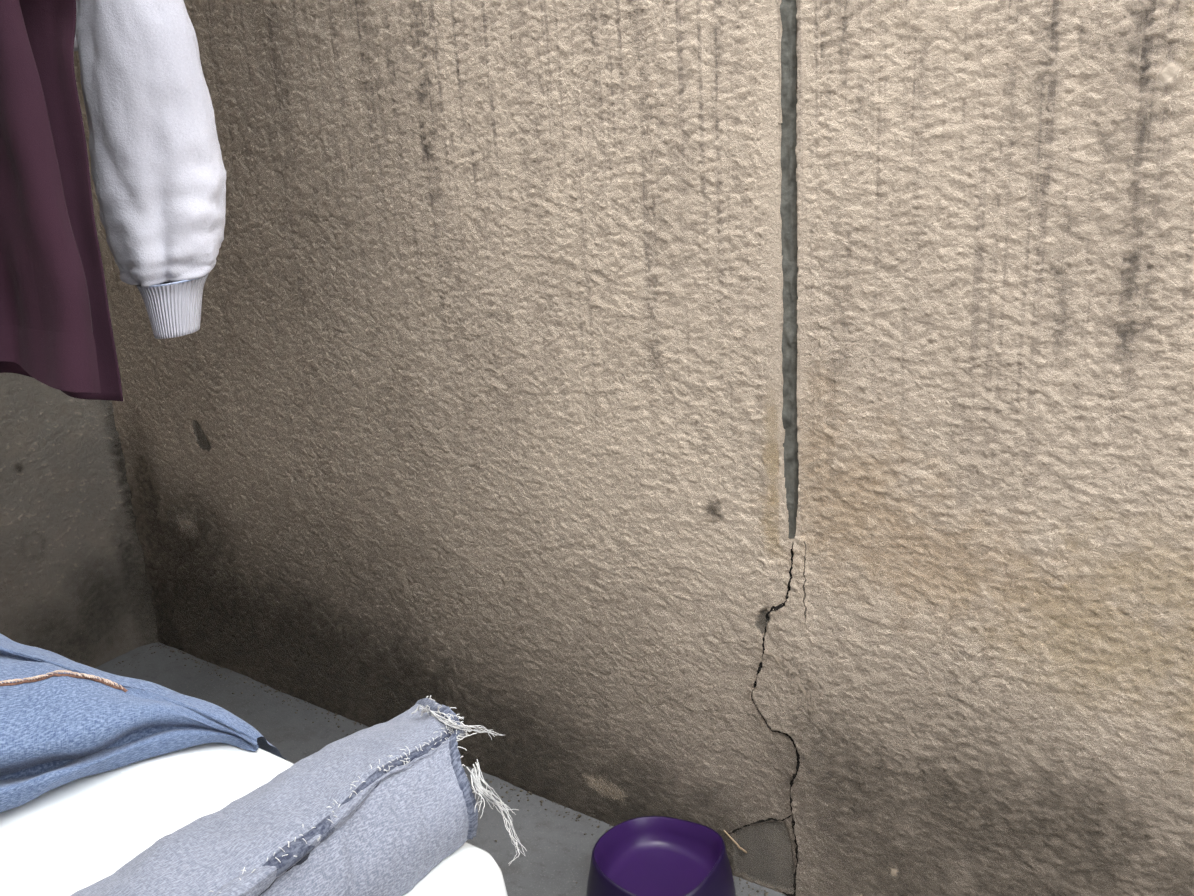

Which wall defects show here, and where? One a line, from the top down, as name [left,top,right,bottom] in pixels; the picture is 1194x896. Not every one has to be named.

leakage [57,429,685,825]
crack [723,541,813,896]